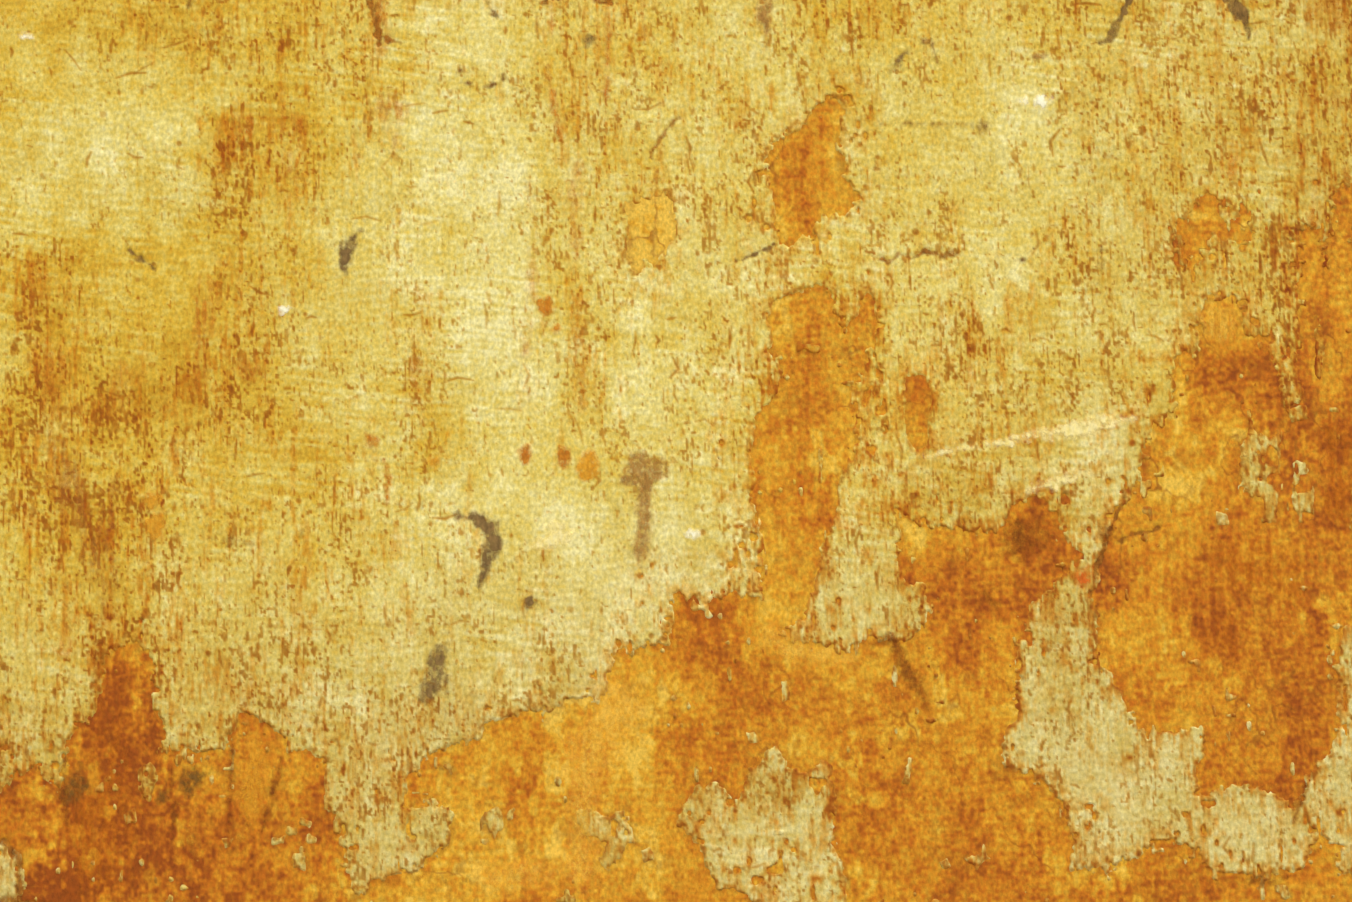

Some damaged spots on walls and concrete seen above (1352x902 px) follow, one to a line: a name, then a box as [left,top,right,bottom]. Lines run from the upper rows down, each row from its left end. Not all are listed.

crack [367,0,394,46]
crack [1098,0,1133,44]
crack [1223,0,1251,39]
peeling [747,87,871,255]
peeling [0,183,1352,902]